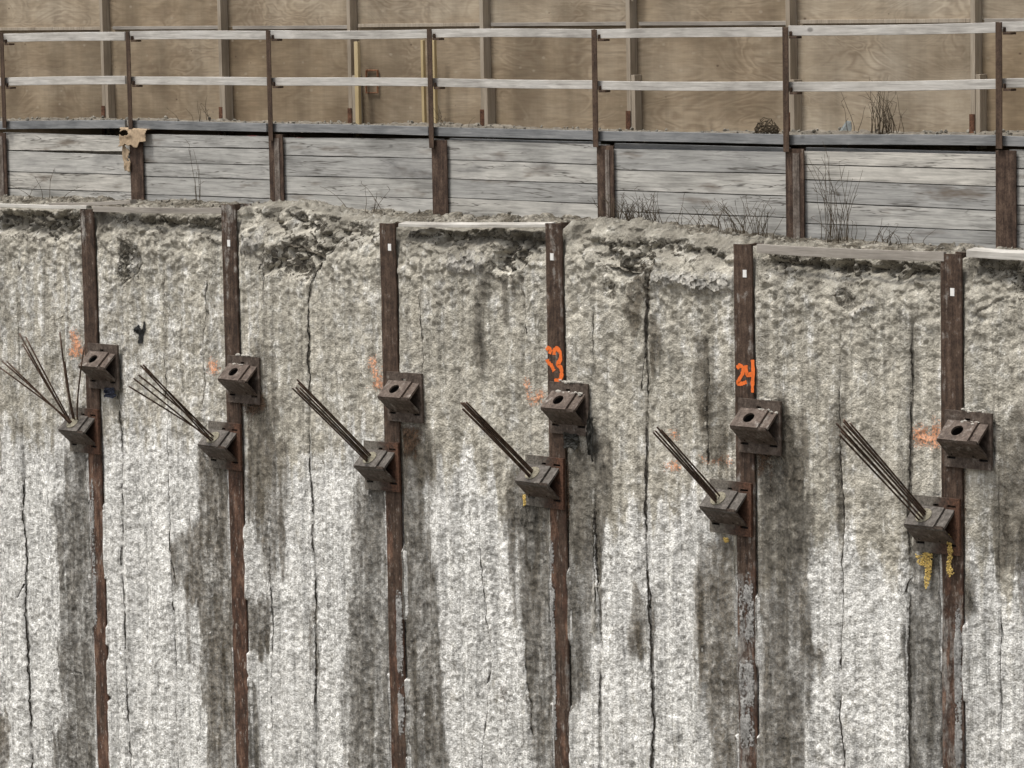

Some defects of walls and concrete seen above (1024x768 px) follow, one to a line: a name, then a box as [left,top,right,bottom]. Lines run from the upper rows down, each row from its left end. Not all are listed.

crack [306,250,334,409]
crack [17,480,34,768]
water stain [171,448,235,768]
crack [309,435,318,719]
water stain [340,477,390,768]
water stain [401,430,448,768]
water stain [501,465,553,768]
crack [641,277,655,768]
water stain [693,536,739,768]
crack [905,331,914,768]
water stain [900,545,943,768]